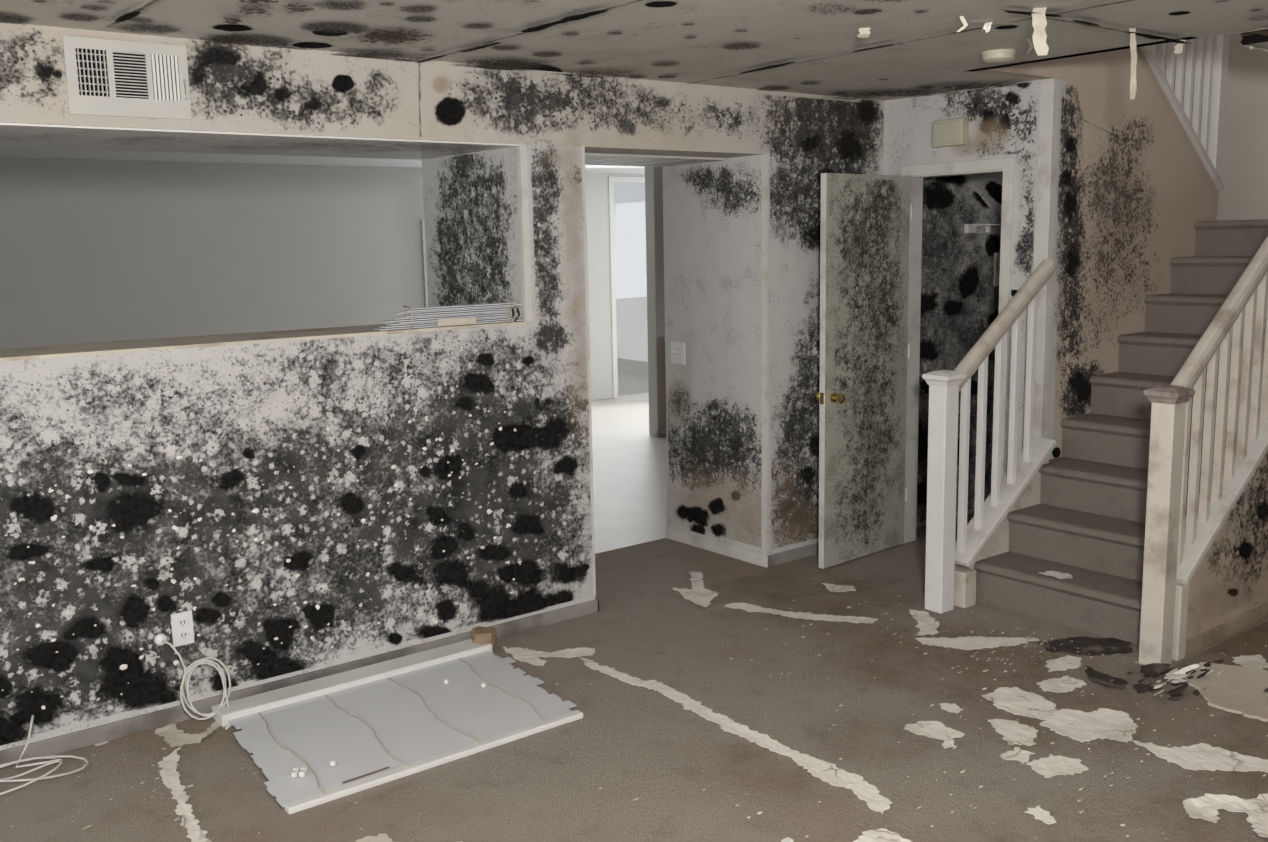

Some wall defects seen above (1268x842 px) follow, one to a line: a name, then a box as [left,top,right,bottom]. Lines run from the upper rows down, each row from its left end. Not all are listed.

leakage [0,13,62,105]
leakage [60,1,112,21]
leakage [113,18,179,34]
leakage [175,1,435,130]
leakage [723,30,759,50]
leakage [804,0,902,14]
leakage [435,46,1037,547]
leakage [1055,87,1159,417]
leakage [0,146,592,746]
leakage [1209,454,1268,604]